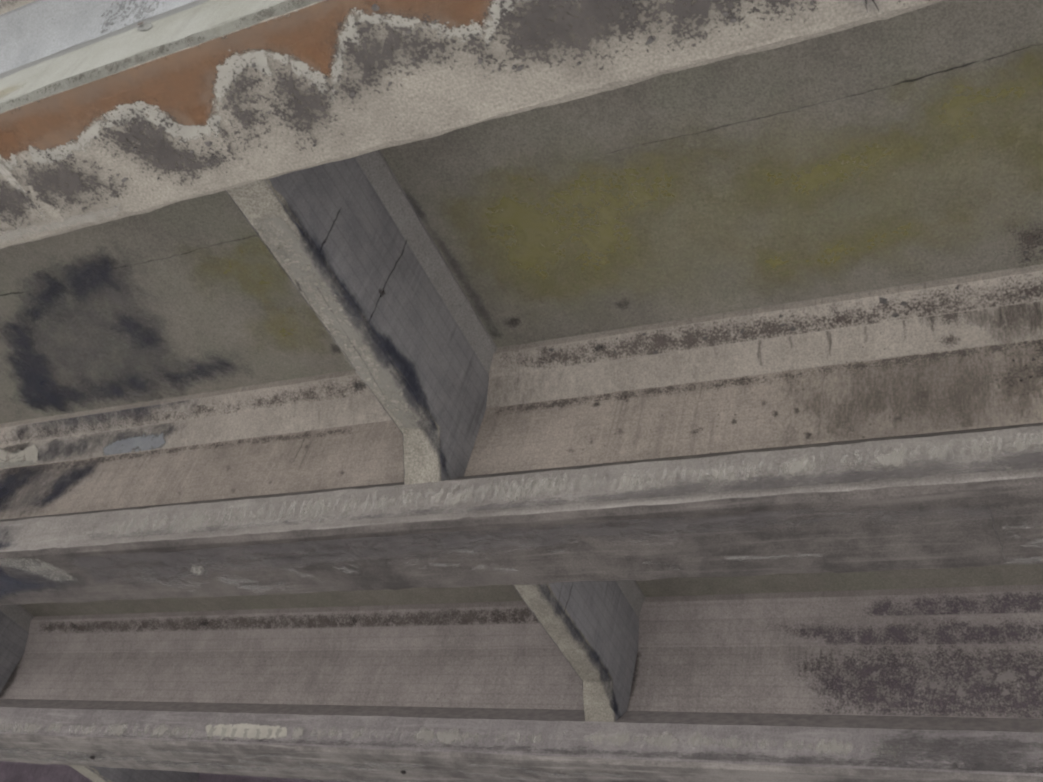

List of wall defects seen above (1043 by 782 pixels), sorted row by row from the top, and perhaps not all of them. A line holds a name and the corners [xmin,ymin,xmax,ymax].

peeling [100,0,164,33]
crack [891,61,979,86]
damp [1,324,366,455]
damp [0,466,38,506]
damp [41,466,92,506]
damp [107,436,1043,537]
damp [0,508,850,597]
damp [40,608,538,633]
damp [536,584,619,716]
damp [780,592,1043,718]
damp [0,723,1043,782]